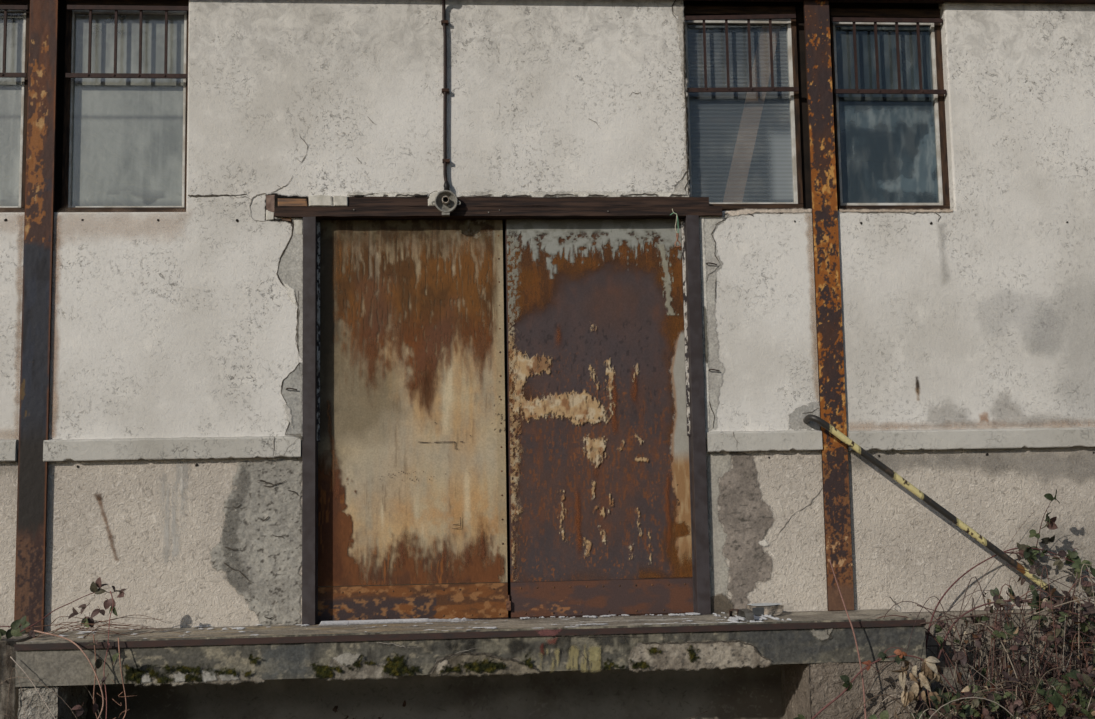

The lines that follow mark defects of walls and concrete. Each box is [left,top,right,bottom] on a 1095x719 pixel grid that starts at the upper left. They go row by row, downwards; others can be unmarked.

crack [188,134,308,221]
flaking render [265,191,440,435]
corrosion [334,232,684,410]
peeling [506,219,692,578]
flaking render [699,214,731,431]
flaking render [210,457,302,626]
corrosion [318,401,505,586]
corrosion [639,478,692,578]
flaking render [707,451,774,614]